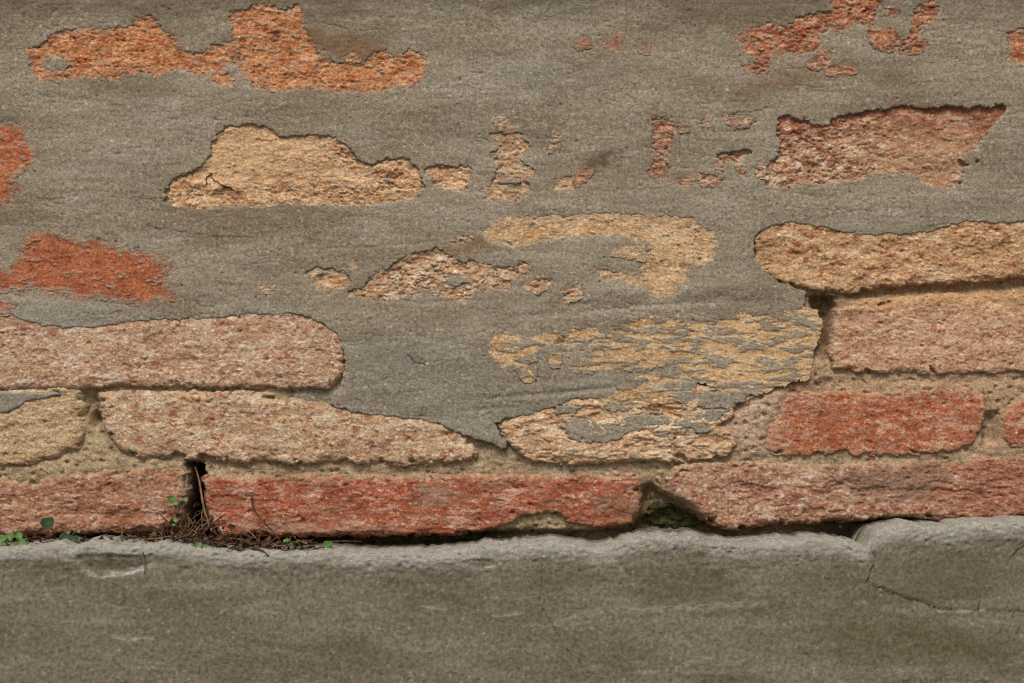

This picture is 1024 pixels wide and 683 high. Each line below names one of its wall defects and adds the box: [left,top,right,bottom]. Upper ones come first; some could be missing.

peeling [25,1,427,97]
peeling [731,0,940,77]
peeling [0,122,39,207]
peeling [165,124,472,210]
peeling [480,113,537,202]
peeling [553,166,594,193]
peeling [647,105,1005,189]
peeling [0,231,179,316]
peeling [306,212,720,305]
peeling [488,331,564,383]
peeling [599,369,697,412]